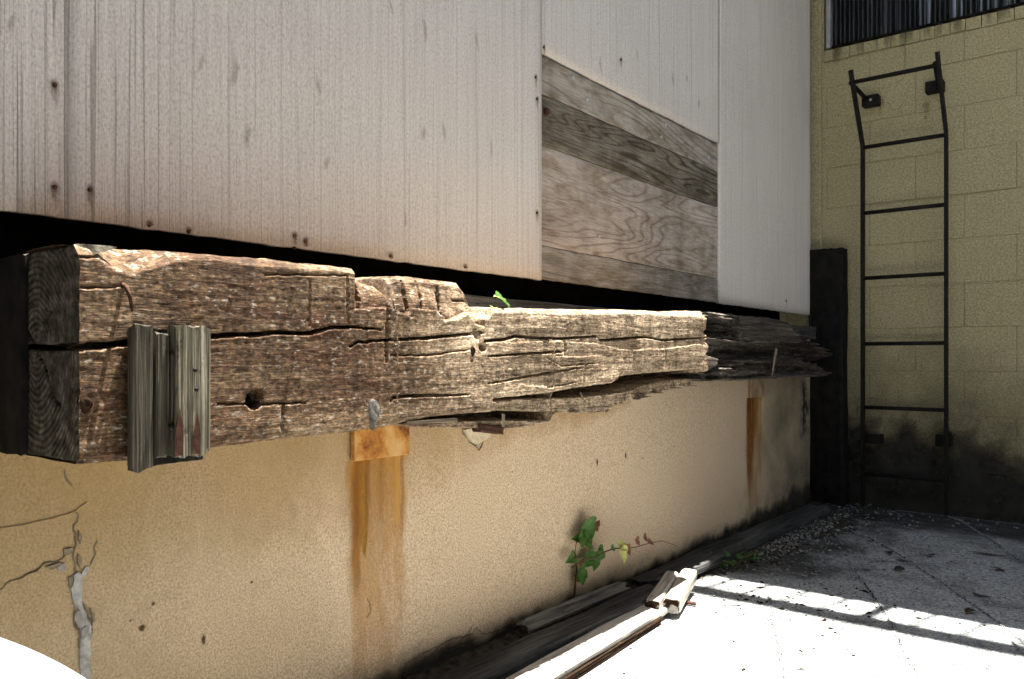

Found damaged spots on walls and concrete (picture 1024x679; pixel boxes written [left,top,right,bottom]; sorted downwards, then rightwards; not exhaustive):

corrosion [349,455,402,583]
corrosion [747,397,761,479]
leakage [848,423,1024,524]
crack [0,512,98,679]